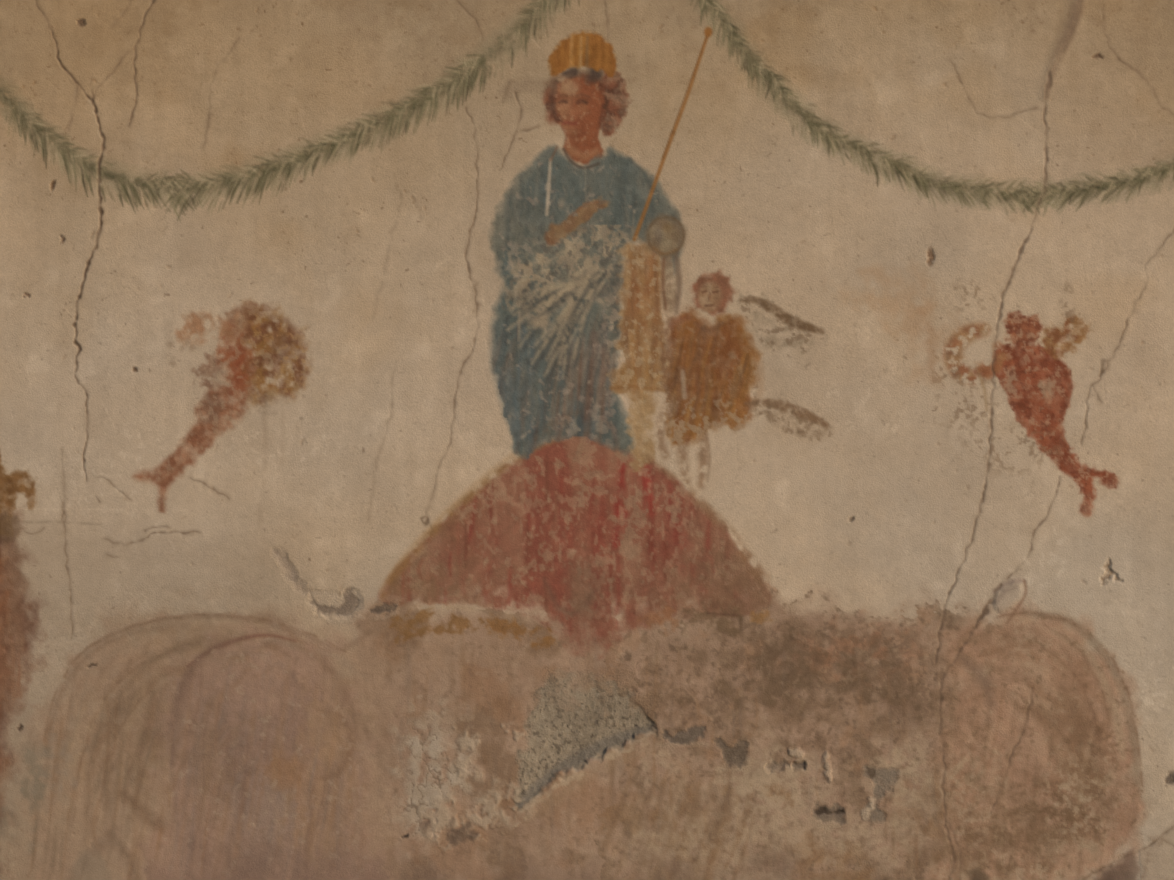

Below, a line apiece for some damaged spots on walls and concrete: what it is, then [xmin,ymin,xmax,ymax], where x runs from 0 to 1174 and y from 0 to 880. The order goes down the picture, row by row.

crack [23,0,203,642]
crack [418,90,541,532]
crack [1077,224,1174,447]
crack [187,474,233,502]
spalling [270,546,400,627]
crack [931,55,1063,880]
spalling [382,662,833,862]
spalling [810,763,902,834]
crack [1078,821,1174,880]